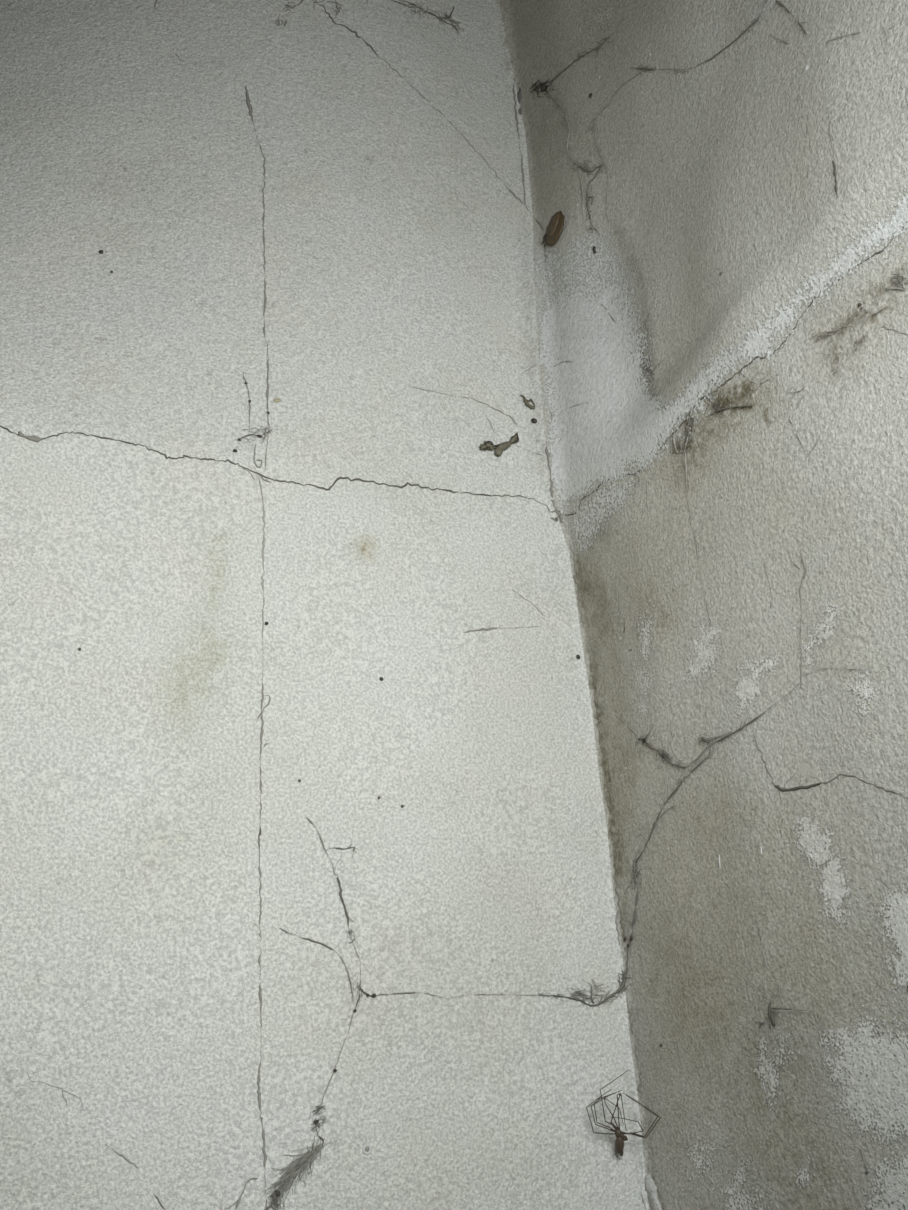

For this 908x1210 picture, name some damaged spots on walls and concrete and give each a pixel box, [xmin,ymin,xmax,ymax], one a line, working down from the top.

crack [819,58,838,197]
crack [627,222,907,487]
crack [0,78,610,1208]
leakage [678,607,784,721]
leakage [842,663,884,720]
crack [589,659,625,941]
crack [753,734,908,804]
leakage [785,805,853,930]
leakage [874,882,908,997]
crack [626,999,643,1099]
leakage [671,1110,840,1210]
leakage [743,993,908,1210]